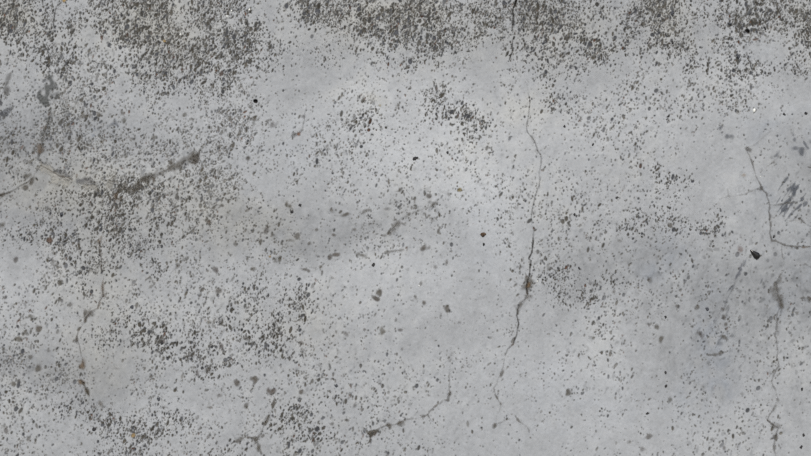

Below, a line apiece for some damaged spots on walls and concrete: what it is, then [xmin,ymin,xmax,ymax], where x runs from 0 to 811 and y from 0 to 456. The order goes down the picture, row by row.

crack [525,240,534,293]